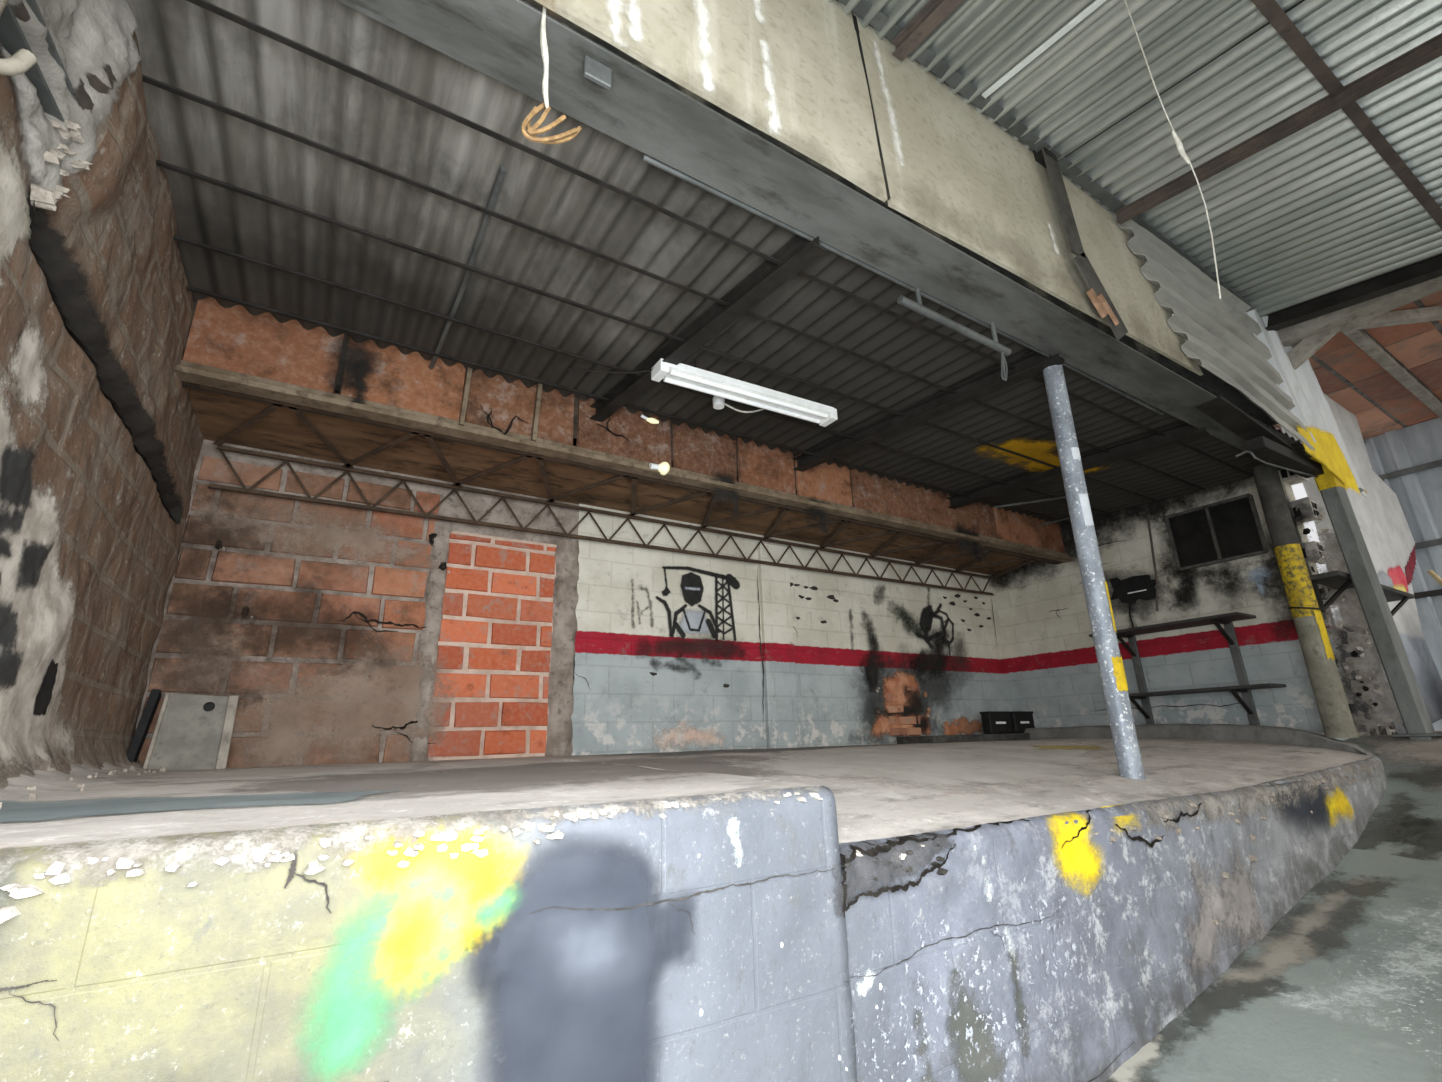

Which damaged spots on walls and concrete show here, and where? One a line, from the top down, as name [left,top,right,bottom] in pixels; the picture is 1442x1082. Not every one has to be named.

spalling [0,0,142,286]
peeling [0,321,76,778]
peeling [655,722,725,749]
spalling [871,672,983,737]
spalling [833,832,956,918]
crack [863,819,1032,845]
crack [1062,803,1202,848]
leakage [1267,871,1392,955]
leakage [1352,767,1442,860]
leakage [948,970,1006,1082]
leakage [1010,955,1028,1056]
leakage [1106,954,1292,1082]